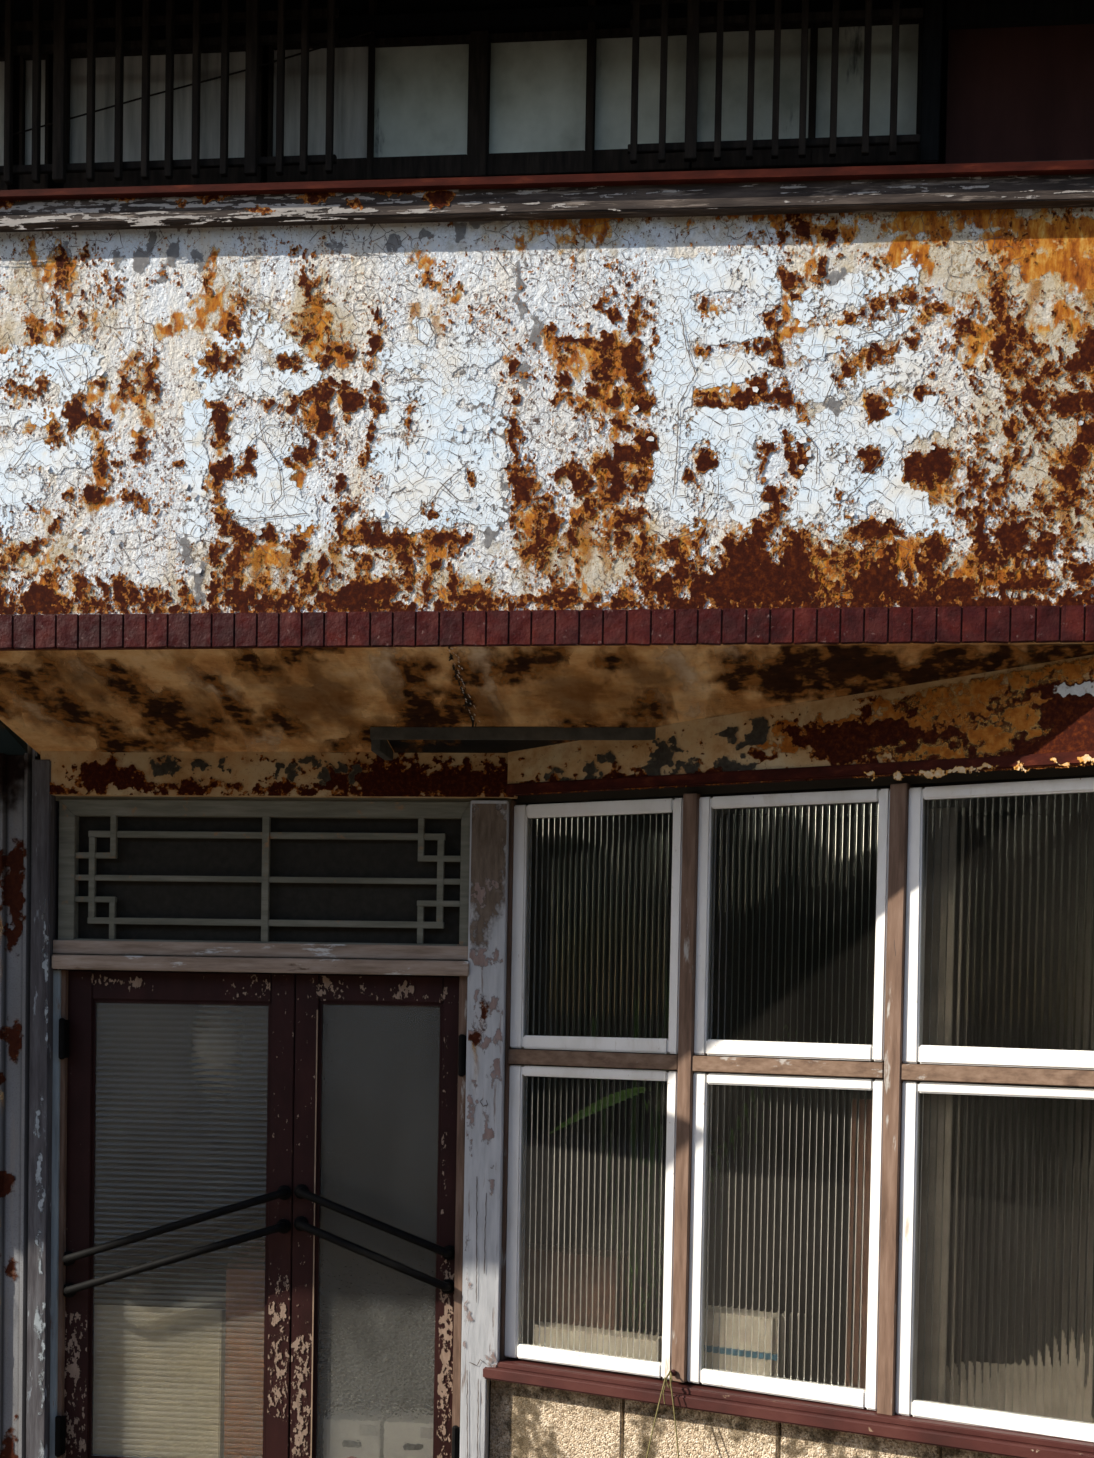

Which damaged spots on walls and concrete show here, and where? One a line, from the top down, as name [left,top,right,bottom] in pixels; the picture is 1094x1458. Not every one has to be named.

peeling [1053,681,1094,698]
corrosion [0,645,1094,808]
corrosion [0,838,27,956]
corrosion [0,1019,24,1085]
corrosion [0,1171,15,1197]
corrosion [4,1257,18,1281]
corrosion [0,1414,18,1458]
damp [498,1382,897,1458]